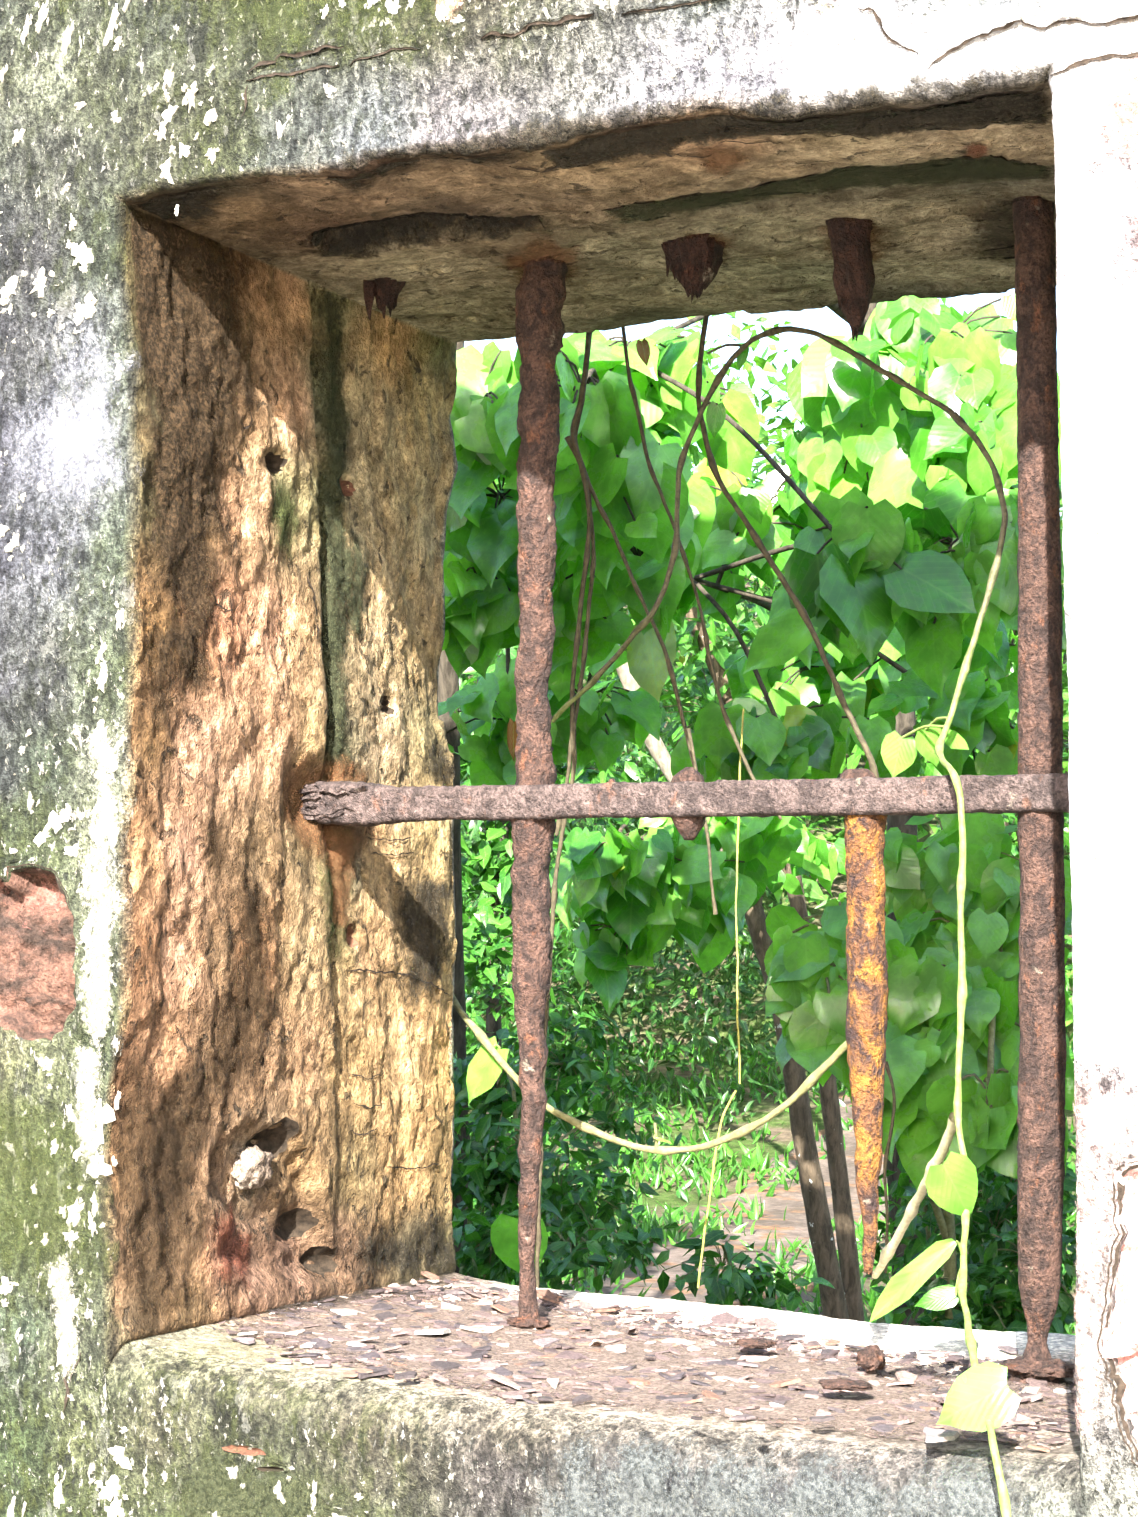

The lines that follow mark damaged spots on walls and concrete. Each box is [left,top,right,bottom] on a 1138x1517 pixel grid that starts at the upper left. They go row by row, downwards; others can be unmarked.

crack [481,0,707,39]
crack [858,7,1138,76]
water stain [307,153,521,190]
corrosion [965,197,1039,262]
water stain [130,179,287,748]
peeling [89,601,126,850]
corrosion [283,759,376,924]
spalling [0,773,82,1089]
mould [397,868,451,1001]
peeling [29,1077,121,1249]
peeling [0,1276,19,1307]
spalling [1073,1087,1138,1470]